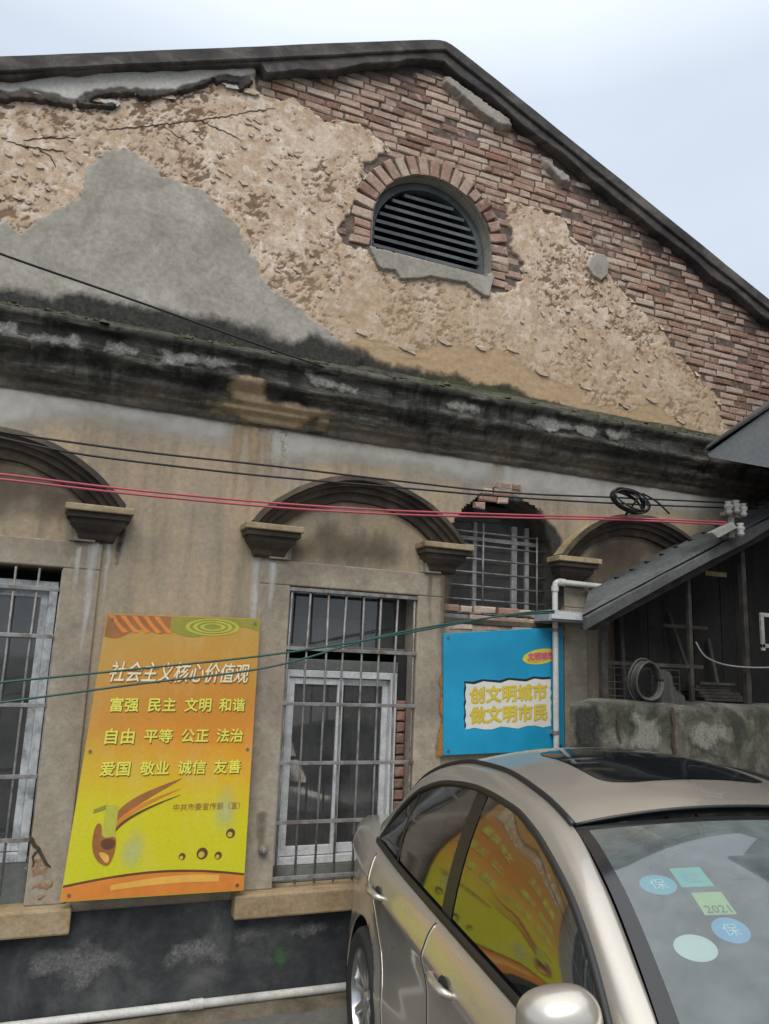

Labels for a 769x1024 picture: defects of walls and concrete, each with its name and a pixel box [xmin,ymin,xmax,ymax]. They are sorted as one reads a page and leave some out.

crack [108,108,273,144]
crack [7,136,76,167]
spalling [0,68,769,429]
damp [0,287,567,407]
damp [0,386,229,509]
flaking render [473,482,521,510]
damp [76,528,126,578]
damp [31,948,125,987]
damp [169,938,223,965]